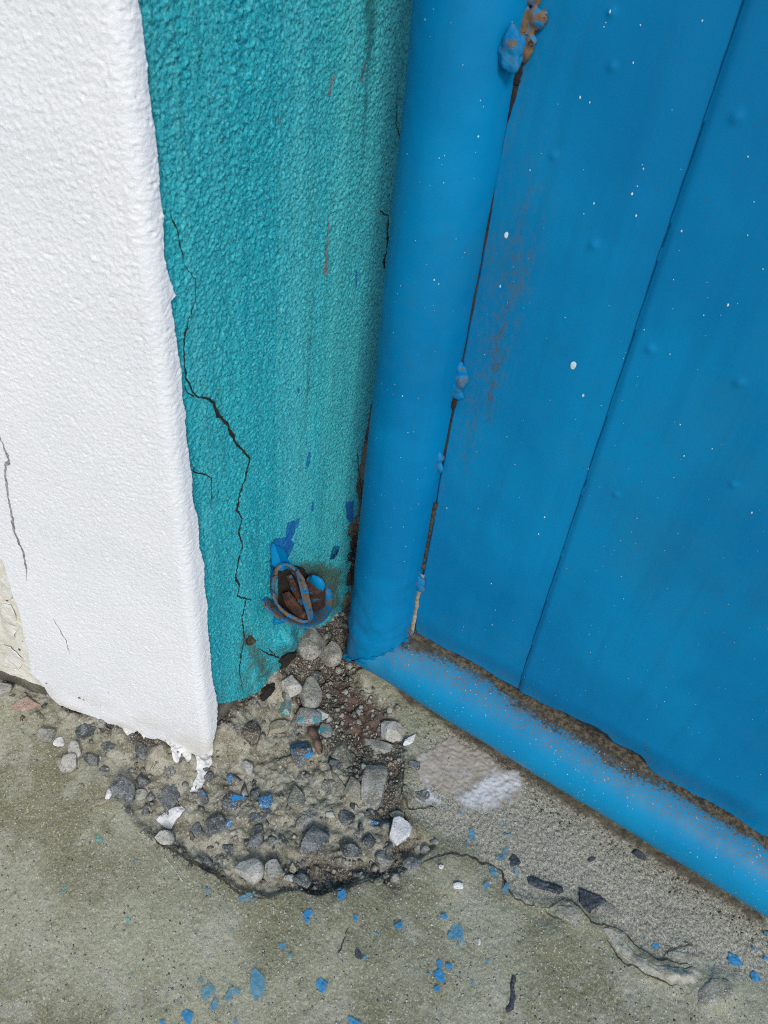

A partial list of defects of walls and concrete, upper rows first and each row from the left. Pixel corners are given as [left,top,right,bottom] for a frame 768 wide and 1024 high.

crack [0,439,27,580]
crack [171,216,279,696]
spalling [342,516,360,617]
spalling [259,683,275,701]
spalling [278,652,297,669]
crack [421,852,693,987]